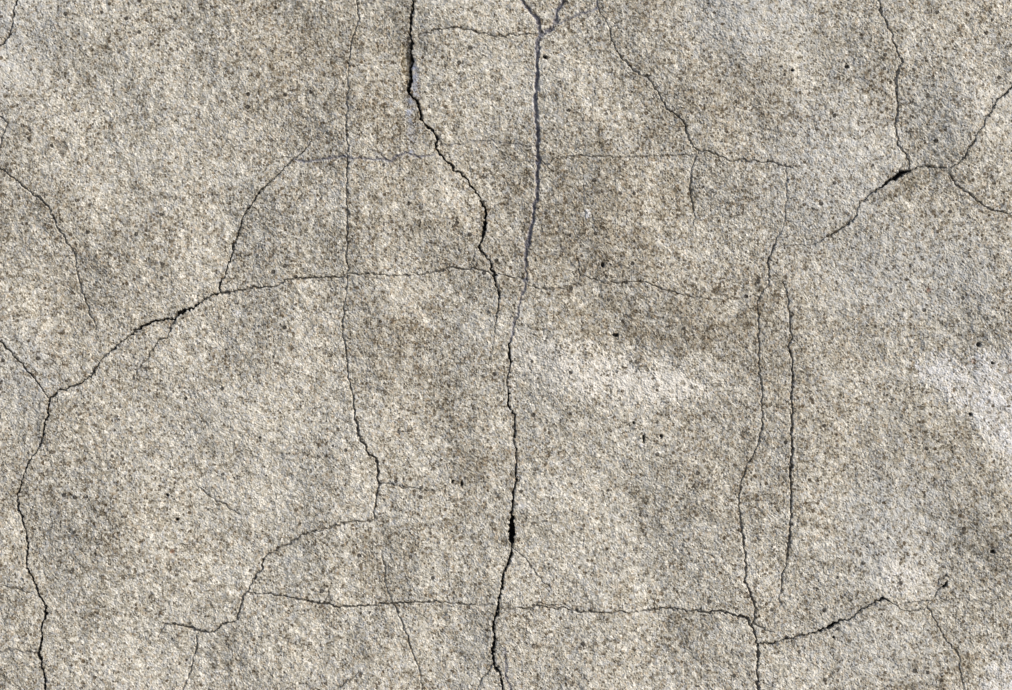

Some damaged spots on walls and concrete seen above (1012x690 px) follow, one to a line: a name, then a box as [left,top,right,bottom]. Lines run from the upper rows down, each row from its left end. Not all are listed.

crack [0,0,528,690]
crack [412,0,1012,690]